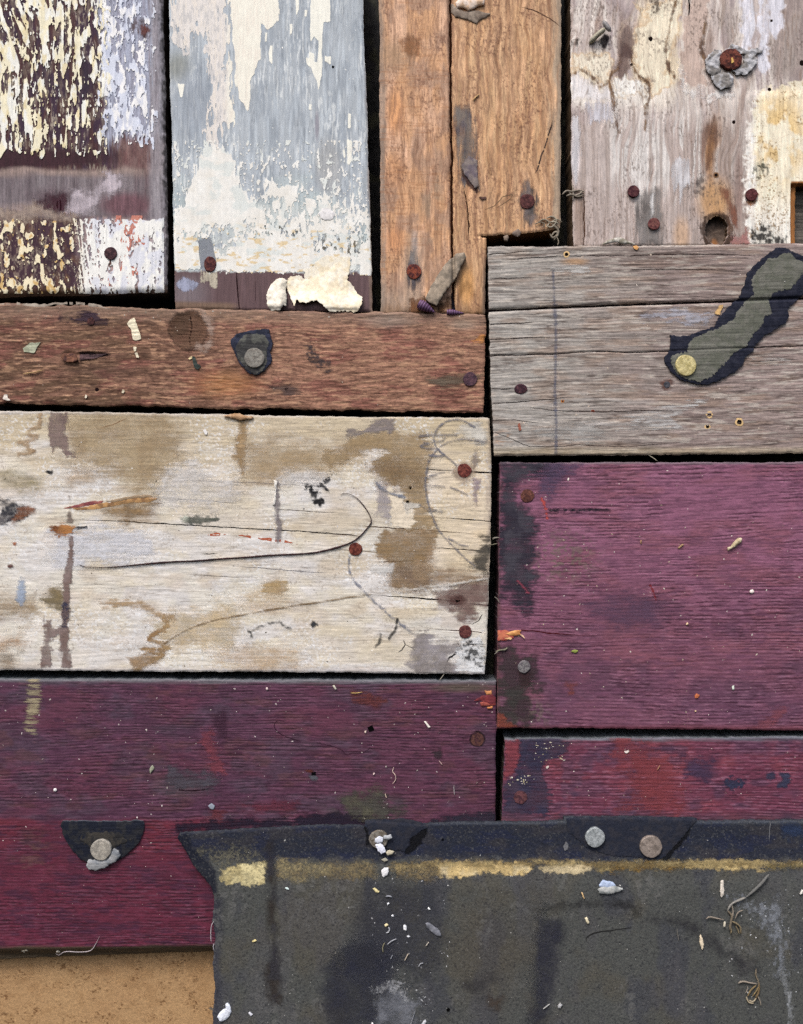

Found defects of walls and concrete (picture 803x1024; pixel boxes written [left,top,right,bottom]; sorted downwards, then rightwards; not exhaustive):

peeling [678,61,734,104]
peeling [0,0,372,313]
peeling [571,101,612,183]
peeling [671,156,690,202]
water stain [233,420,579,622]